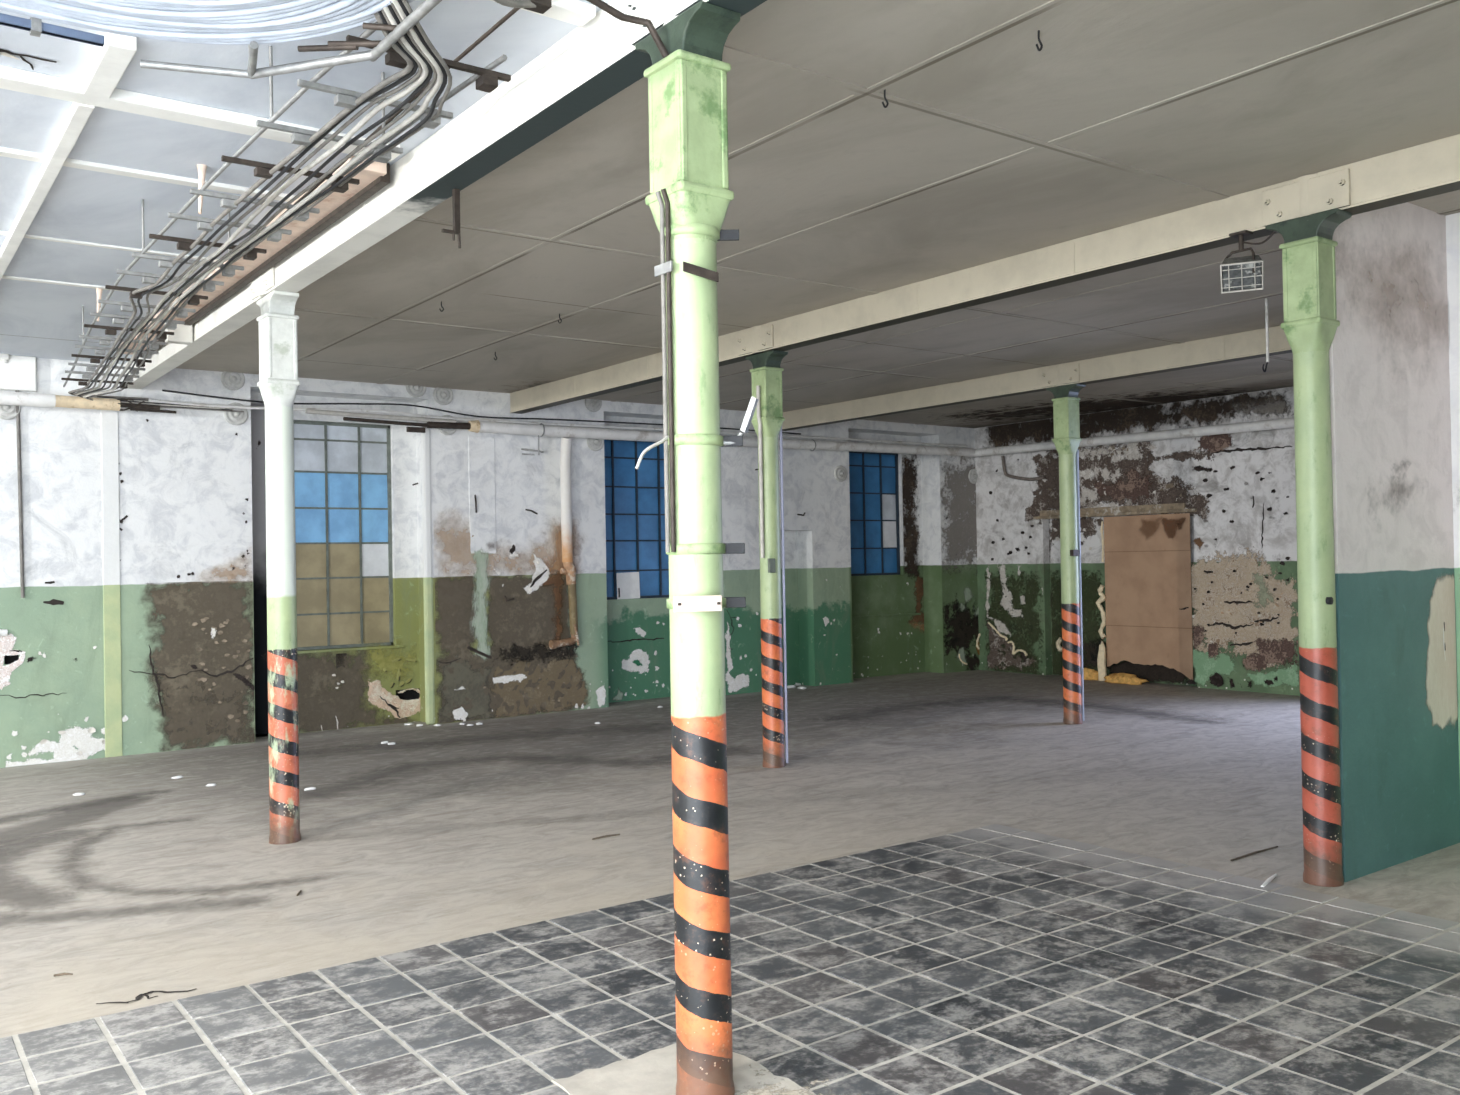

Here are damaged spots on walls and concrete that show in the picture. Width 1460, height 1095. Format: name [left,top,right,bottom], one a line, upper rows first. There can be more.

spalling [0,629,62,698]
peeling [5,717,105,767]
spalling [367,658,493,726]
peeling [492,674,527,684]
rust [542,531,574,640]
spalling [976,519,1043,670]
water stain [937,388,1291,684]
flaking render [1187,538,1299,690]